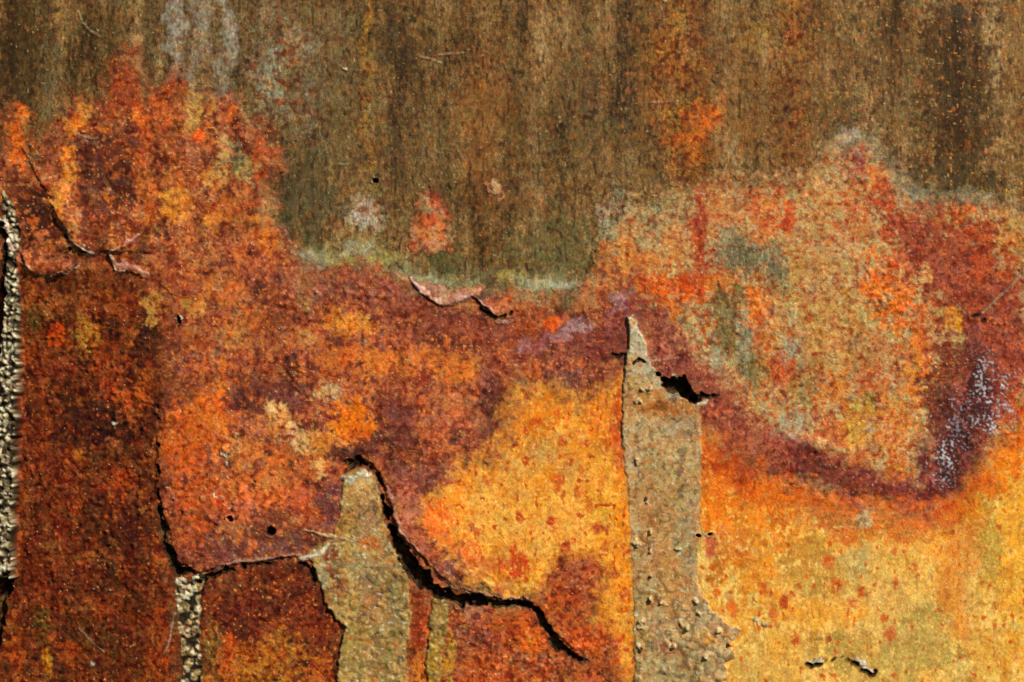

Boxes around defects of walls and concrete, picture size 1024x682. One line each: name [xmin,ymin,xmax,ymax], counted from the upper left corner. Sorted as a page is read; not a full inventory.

peeling [0,190,80,579]
rust [0,39,309,278]
peeling [175,573,205,682]
crack [155,443,317,584]
peeling [296,468,412,682]
rust [405,185,462,257]
peeling [409,276,514,324]
crack [343,455,587,662]
rust [483,177,506,202]
rust [0,204,1024,682]
peeling [622,315,741,682]
rust [579,0,1024,477]